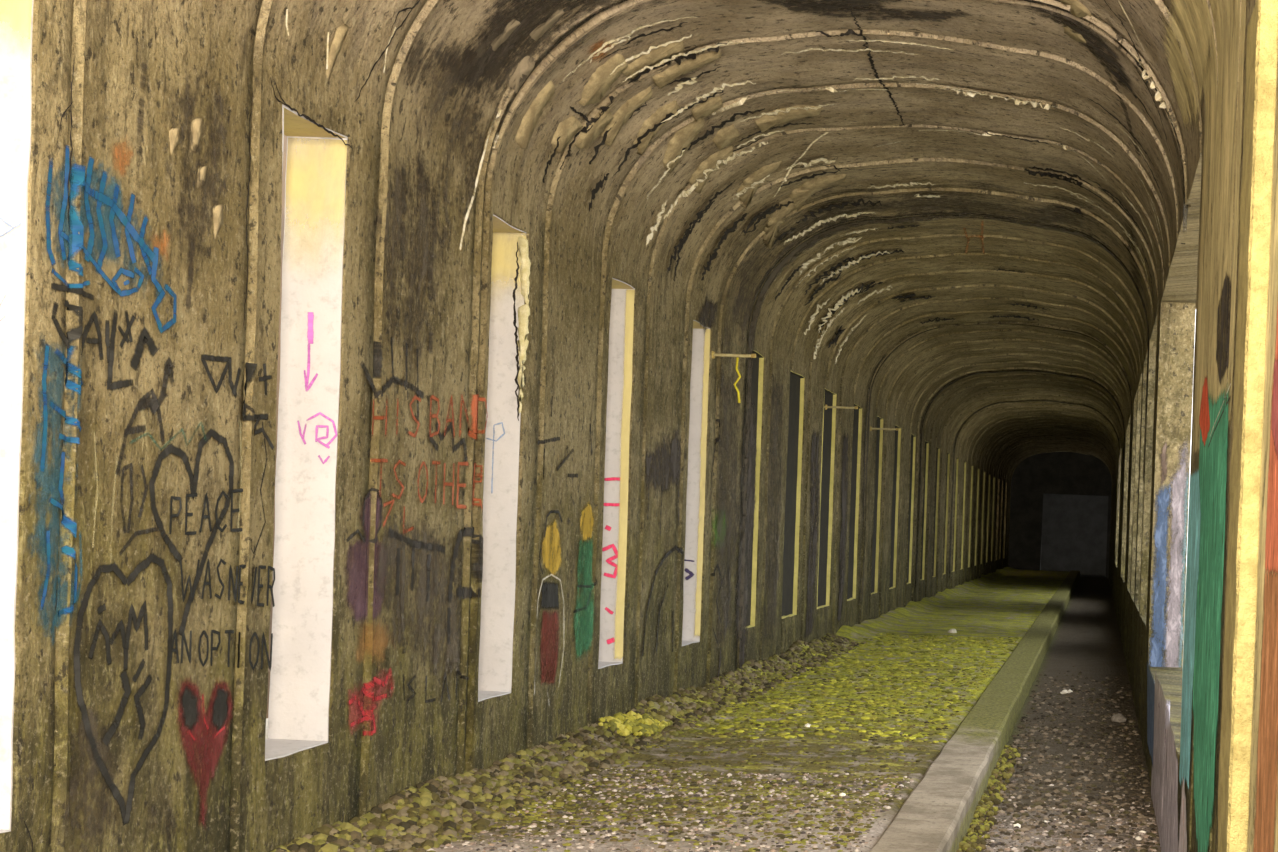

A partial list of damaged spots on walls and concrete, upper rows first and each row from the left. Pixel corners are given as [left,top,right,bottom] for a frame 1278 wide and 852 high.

damp [371,0,697,363]
damp [610,34,744,82]
crack [543,12,955,348]
crack [993,303,1050,321]